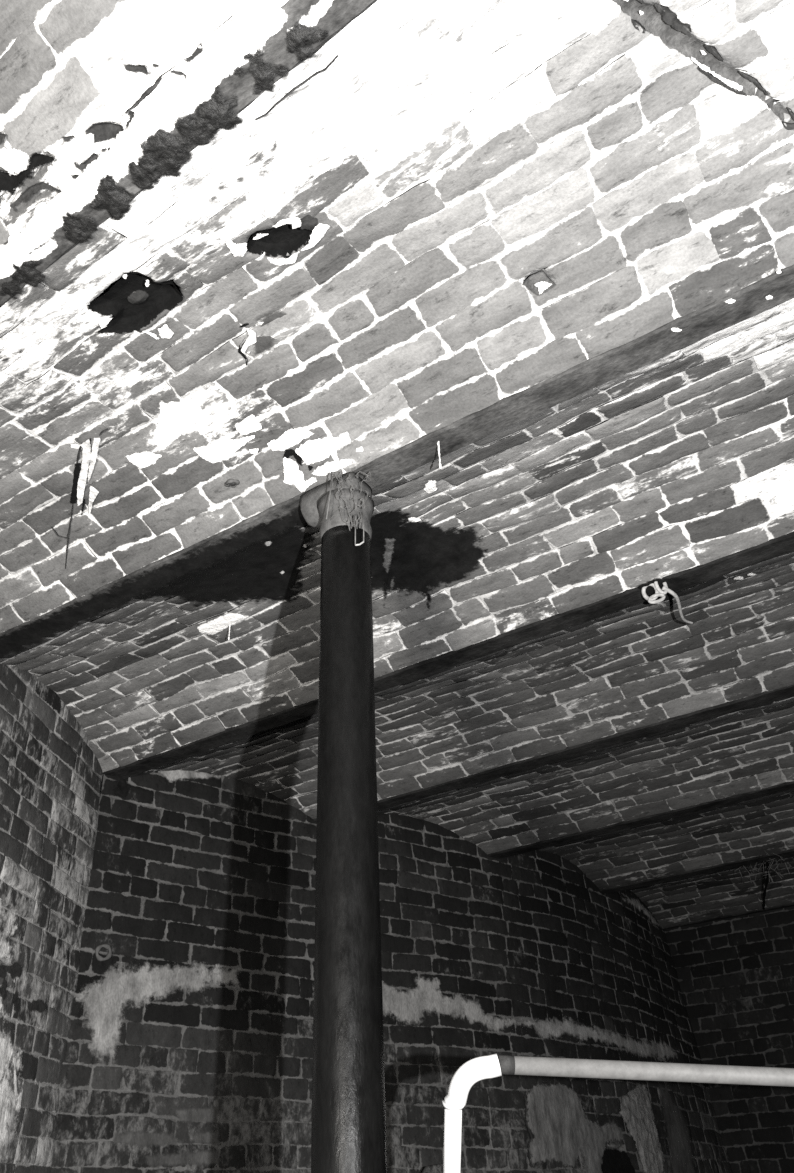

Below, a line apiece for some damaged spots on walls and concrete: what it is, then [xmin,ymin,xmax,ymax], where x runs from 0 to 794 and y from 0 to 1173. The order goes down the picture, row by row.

spalling [124,42,203,99]
rust [232,22,328,95]
spalling [0,111,135,211]
rust [62,86,243,244]
spalling [226,215,330,266]
rust [0,260,46,299]
spalling [88,272,183,339]
peeling [125,452,161,468]
peeling [193,415,363,476]
damp [370,509,488,609]